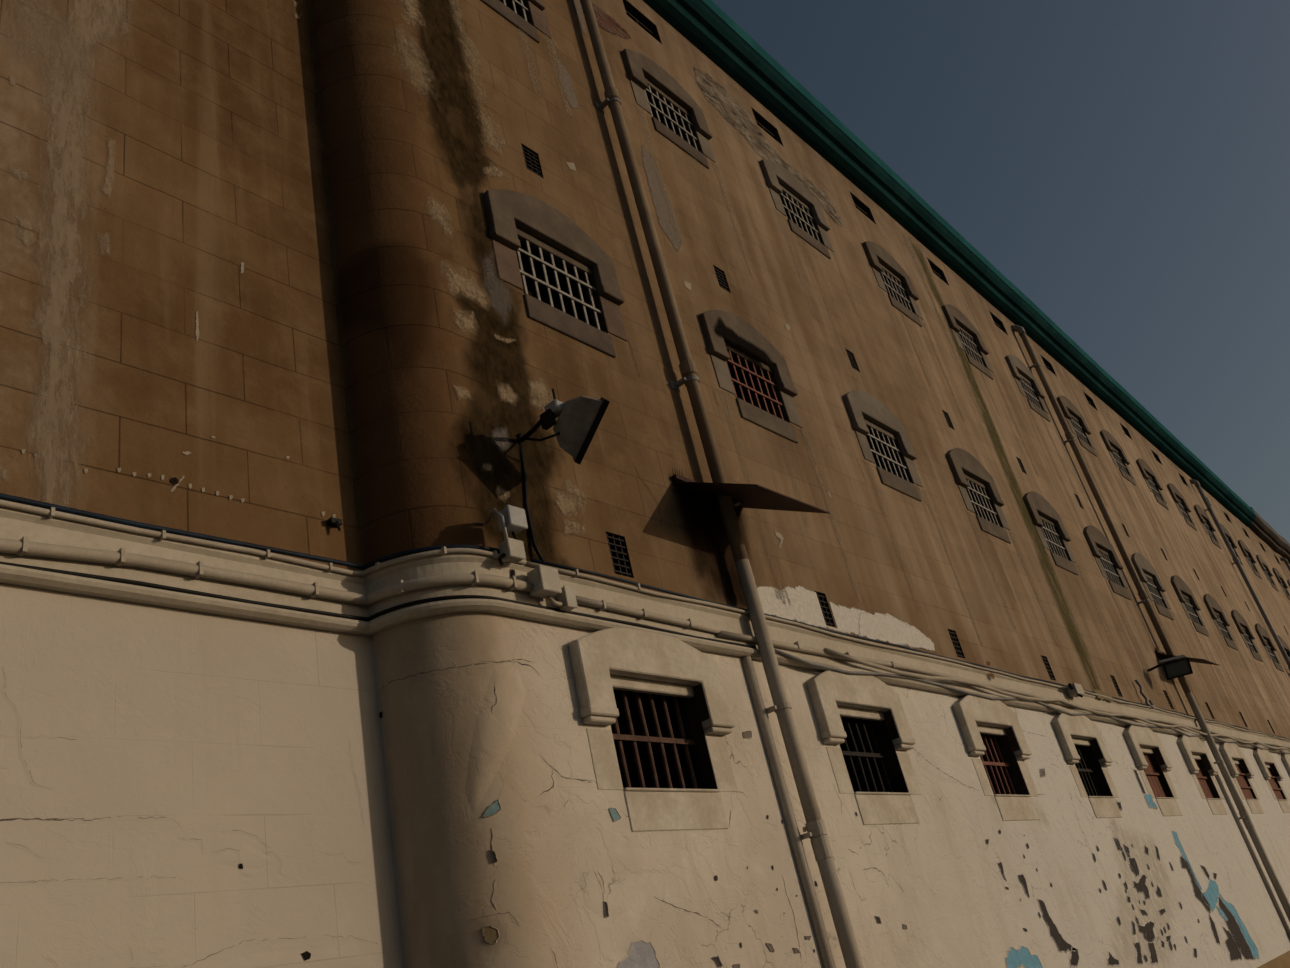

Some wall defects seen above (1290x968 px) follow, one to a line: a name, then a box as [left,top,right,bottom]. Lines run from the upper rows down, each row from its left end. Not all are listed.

water stain [27,0,128,506]
water stain [399,0,586,572]
crack [0,667,289,886]
peeling [482,799,502,818]
peeling [608,807,621,822]
peeling [1133,769,1158,810]
peeling [616,938,660,968]
spalling [997,835,1079,968]
spalling [1098,830,1259,967]